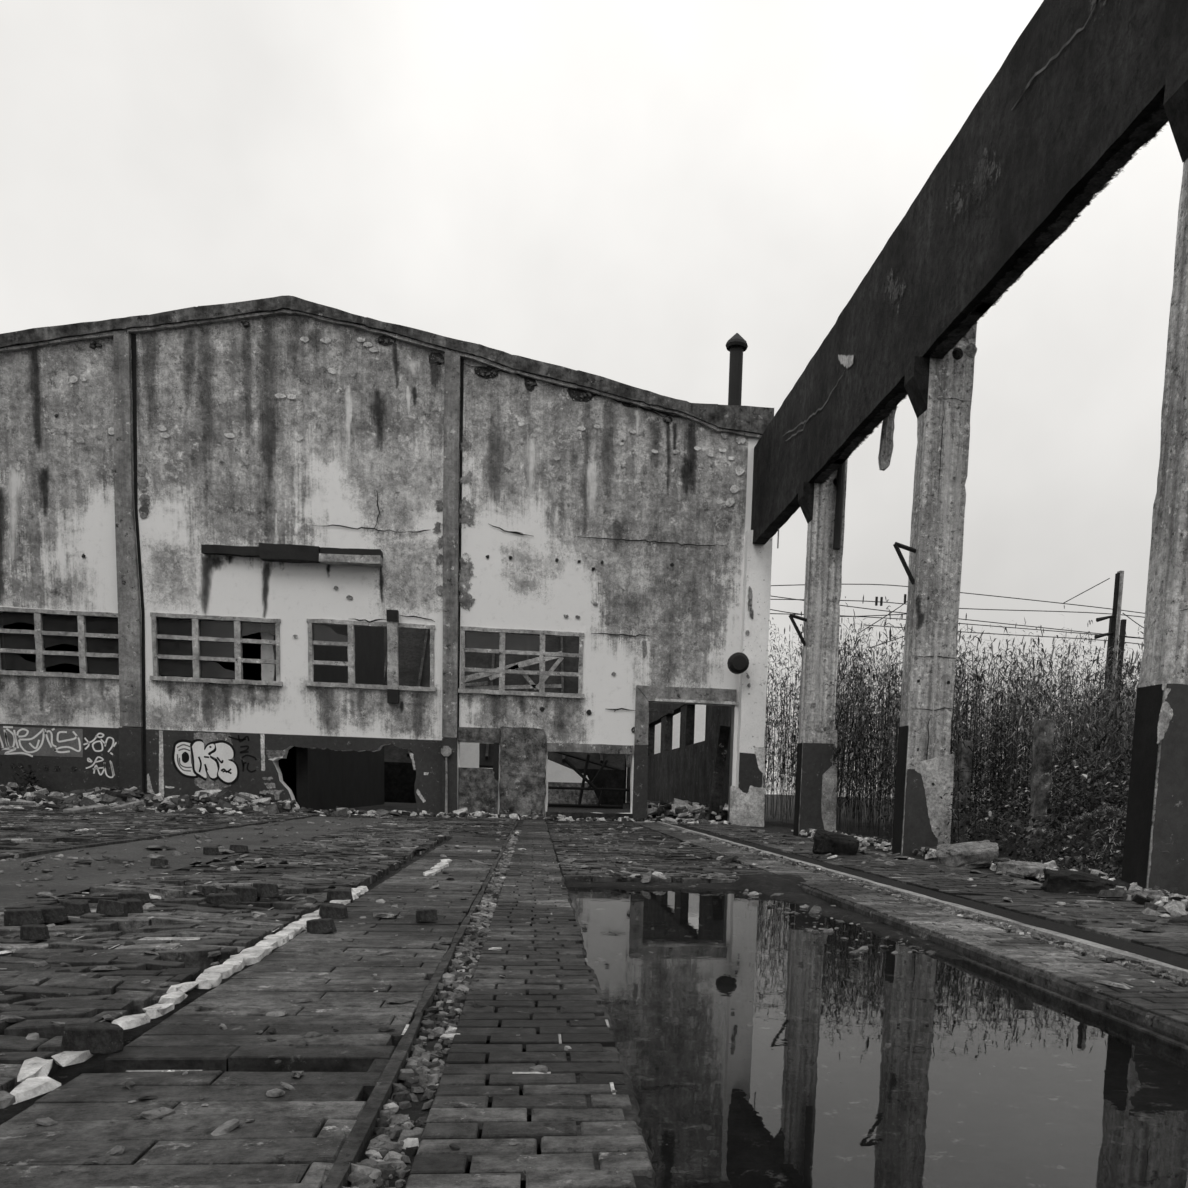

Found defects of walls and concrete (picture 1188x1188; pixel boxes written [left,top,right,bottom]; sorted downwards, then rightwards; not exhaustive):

damp [31,348,42,448]
damp [371,390,385,446]
damp [393,344,440,411]
damp [0,468,22,591]
damp [40,469,48,515]
crack [313,493,428,533]
damp [527,436,537,493]
damp [587,463,597,510]
damp [666,423,704,491]
peeling [300,686,437,739]